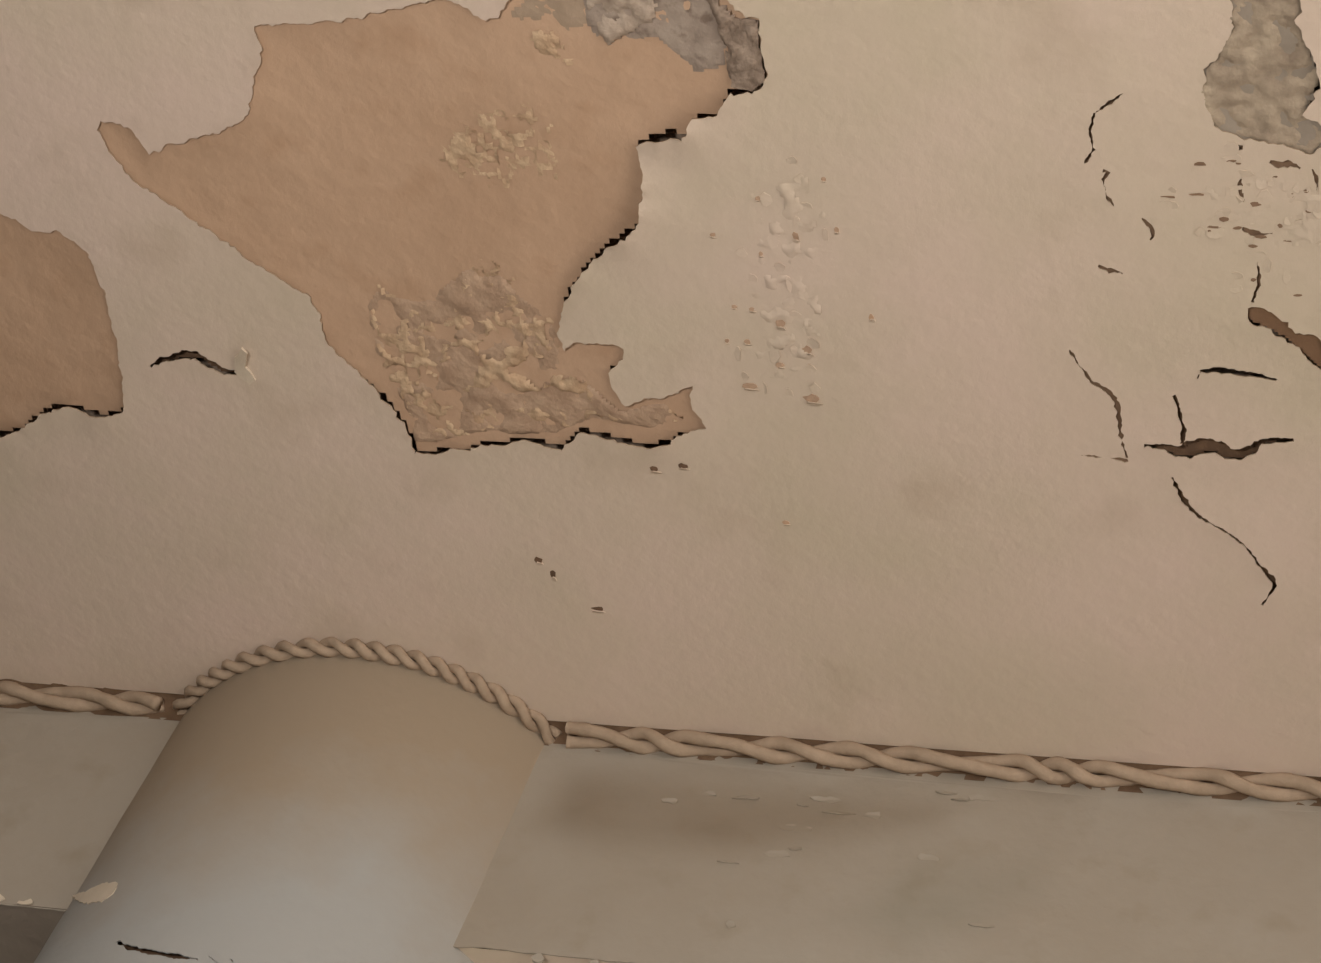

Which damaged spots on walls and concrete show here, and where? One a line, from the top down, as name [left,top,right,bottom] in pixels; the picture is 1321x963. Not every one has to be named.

peeling [0,214,124,431]
crack [153,348,256,385]
peeling [97,0,768,452]
crack [1084,94,1121,206]
crack [1098,265,1122,273]
crack [1142,141,1321,366]
peeling [1202,0,1321,154]
crack [1069,350,1294,603]